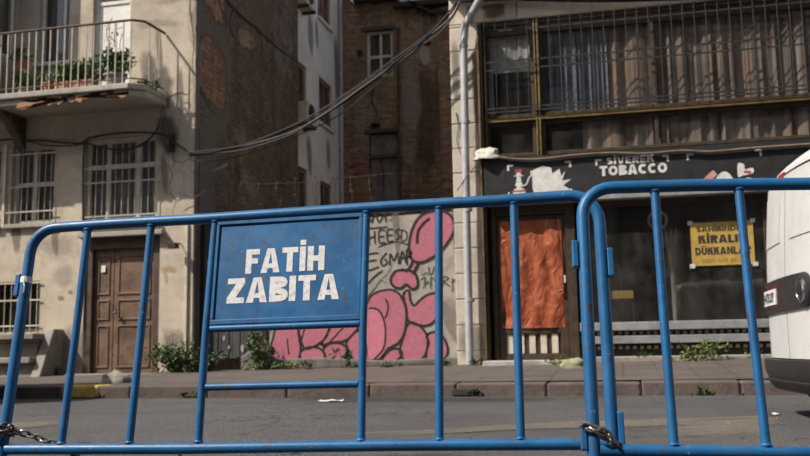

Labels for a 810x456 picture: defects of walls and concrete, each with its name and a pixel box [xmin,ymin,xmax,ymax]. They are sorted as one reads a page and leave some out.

spalling [16,89,129,109]
flaking render [195,26,227,120]
damp [417,73,440,173]